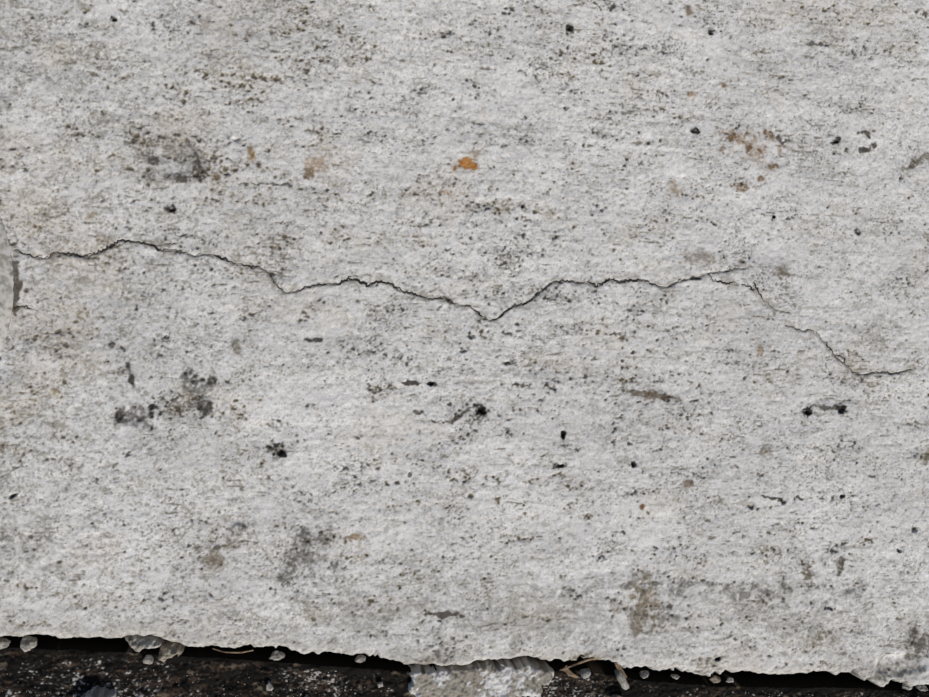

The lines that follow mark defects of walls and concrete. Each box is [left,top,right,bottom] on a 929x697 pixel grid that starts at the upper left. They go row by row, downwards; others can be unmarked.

crack [16,239,910,375]